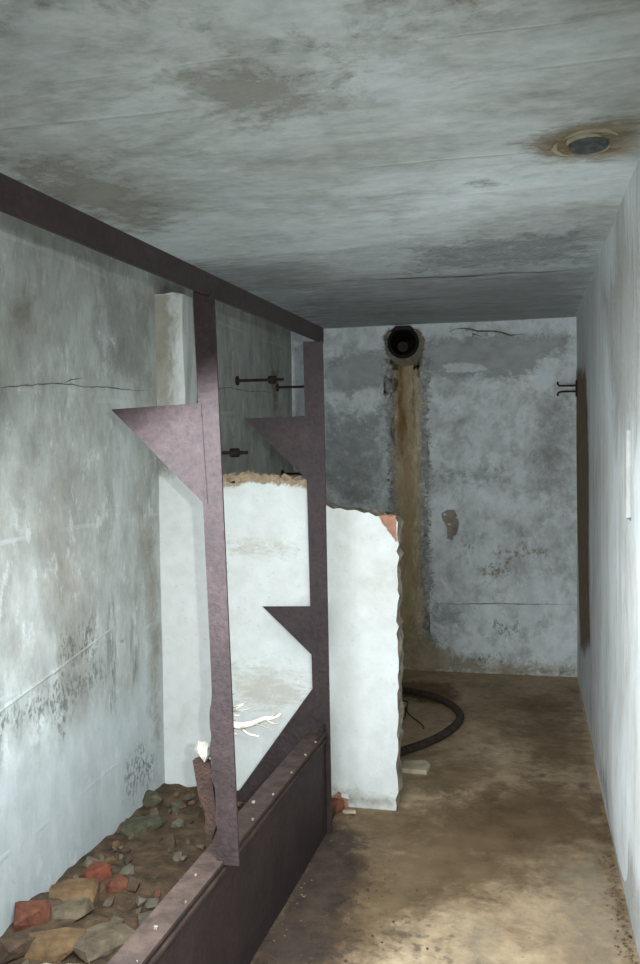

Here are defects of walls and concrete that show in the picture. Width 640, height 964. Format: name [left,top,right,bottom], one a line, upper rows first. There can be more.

corrosion [530,119,640,160]
crack [0,378,148,391]
corrosion [383,329,434,645]
spalling [379,515,398,542]
water stain [29,669,97,714]
water stain [309,761,612,964]